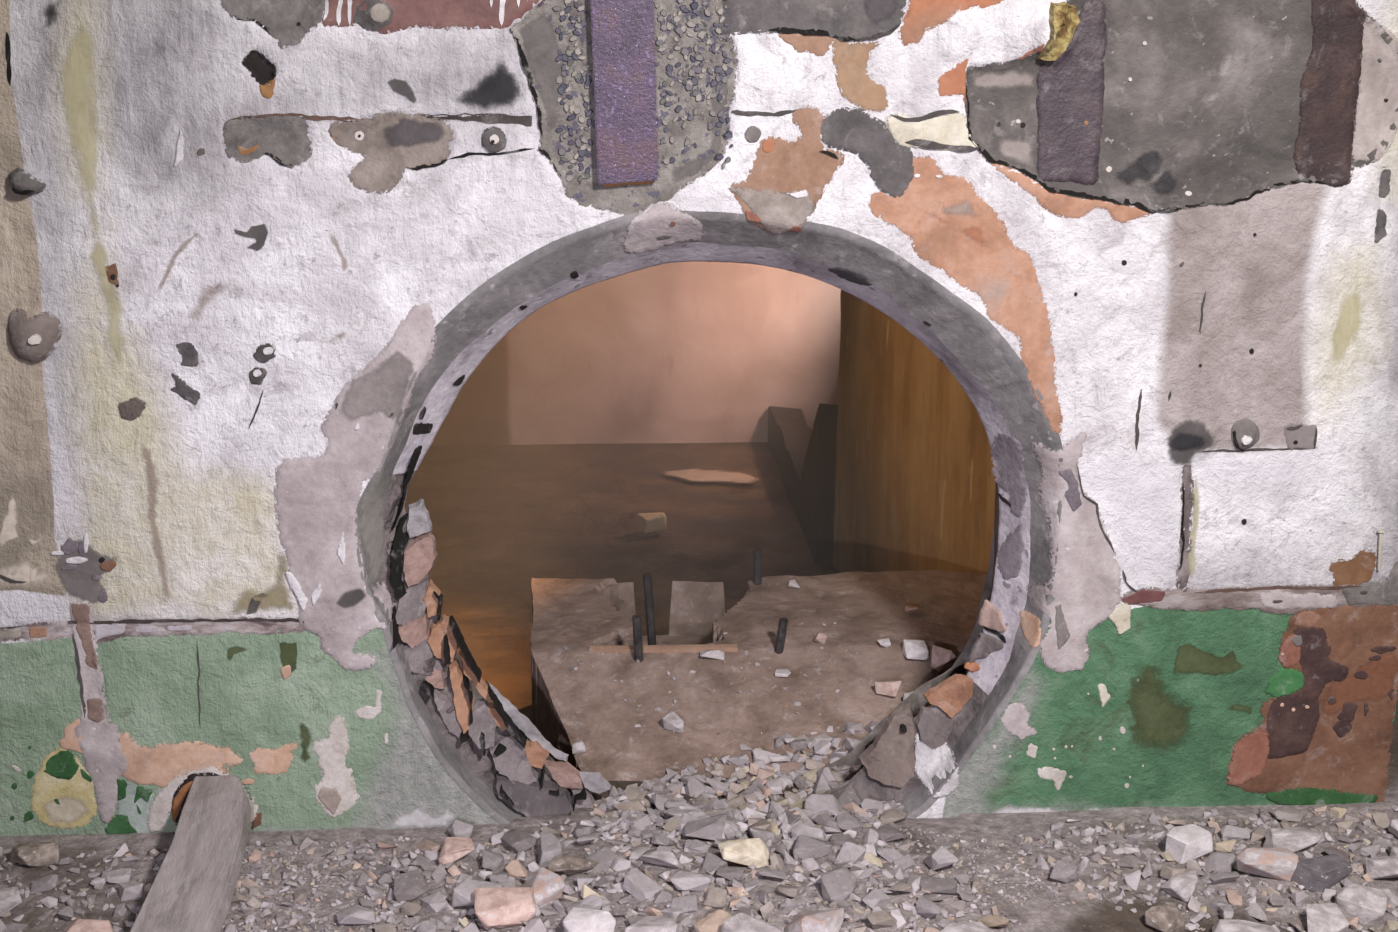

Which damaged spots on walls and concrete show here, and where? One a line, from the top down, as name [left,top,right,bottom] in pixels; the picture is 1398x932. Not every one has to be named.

spalling [510,0,1063,435]
peeling [979,152,1150,224]
spalling [990,433,1027,580]
peeling [0,497,383,834]
flaking render [389,407,621,817]
flaking render [858,600,1007,788]
peeling [993,702,1073,791]
peeling [1265,667,1304,698]
peeling [1266,787,1378,805]